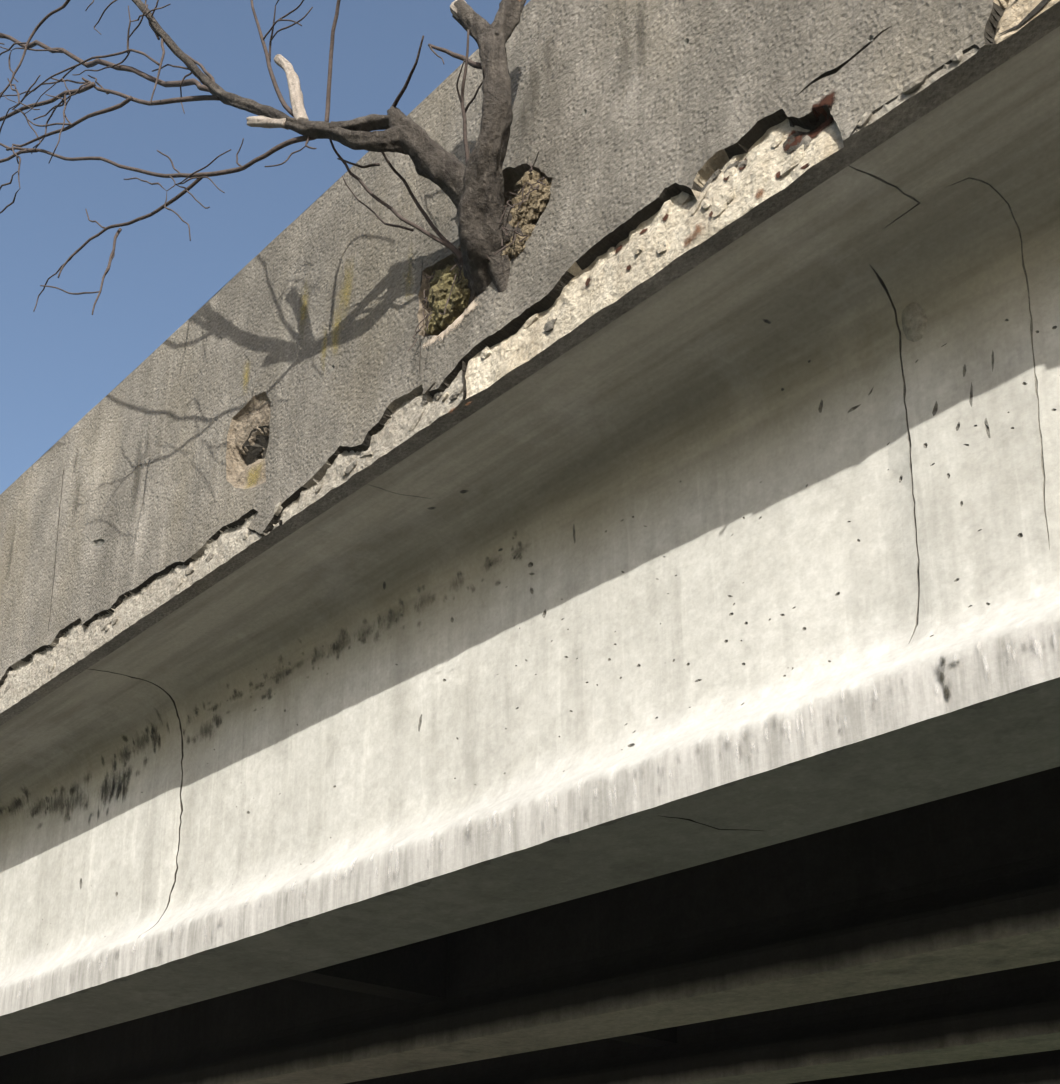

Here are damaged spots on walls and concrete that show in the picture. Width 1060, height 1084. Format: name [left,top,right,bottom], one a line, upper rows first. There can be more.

corrosion [784,91,835,150]
crack [795,26,892,97]
spalling [856,0,1060,132]
spalling [0,95,844,714]
crack [869,264,920,643]
crack [944,177,1050,550]
leakage [0,710,169,826]
crack [90,669,184,939]